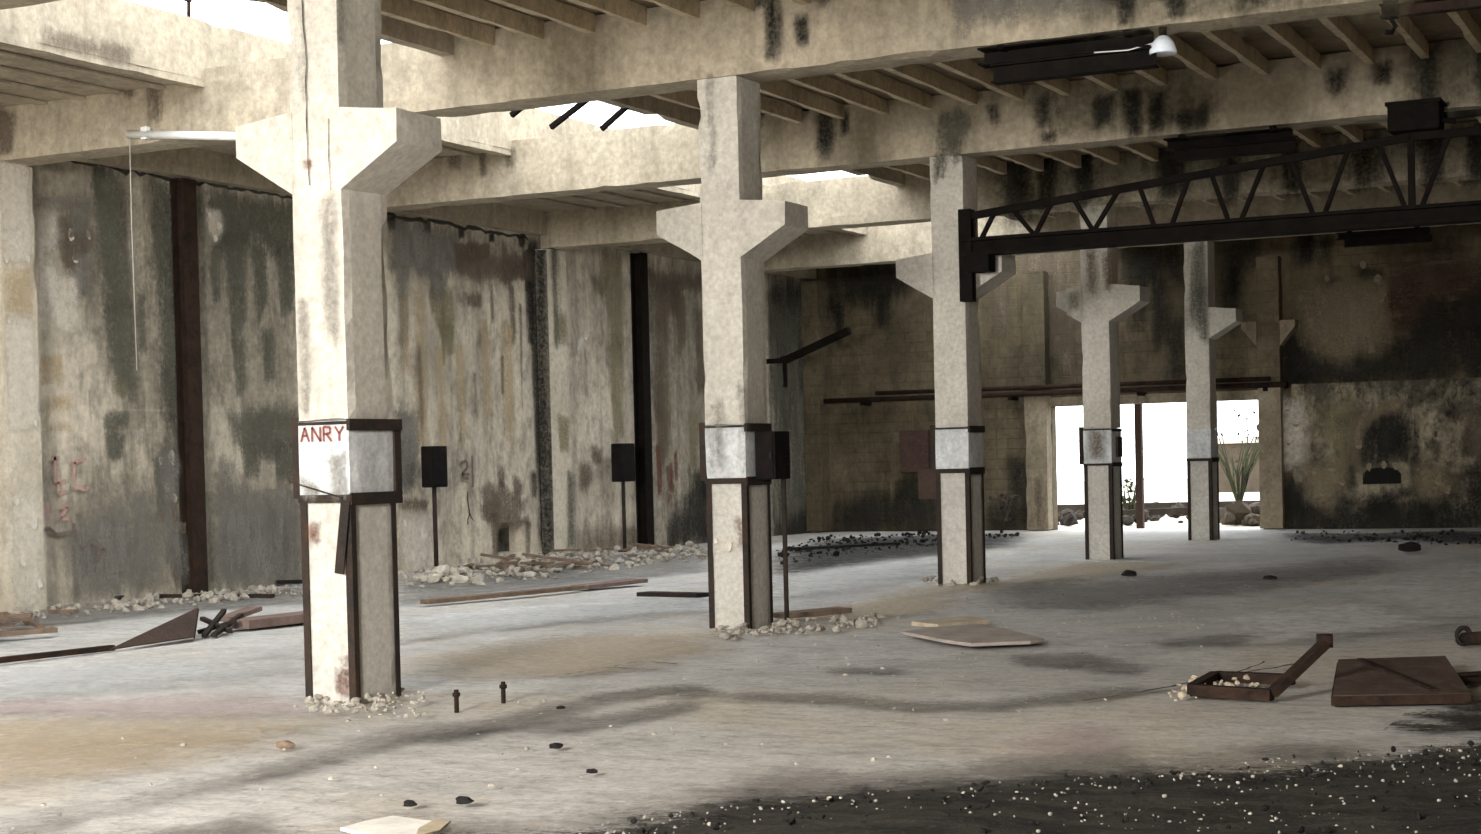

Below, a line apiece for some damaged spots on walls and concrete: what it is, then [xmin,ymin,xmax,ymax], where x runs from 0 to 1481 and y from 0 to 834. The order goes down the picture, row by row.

damp [757,0,808,58]
damp [955,0,1267,25]
damp [1327,68,1347,95]
damp [1372,41,1481,100]
damp [934,109,971,179]
damp [992,76,1481,223]
damp [38,168,180,597]
damp [387,214,638,556]
damp [1284,404,1481,529]